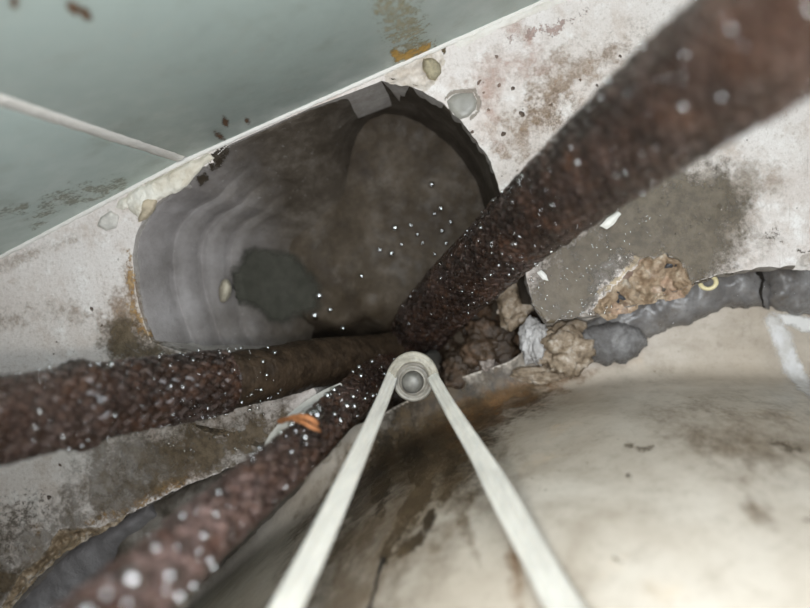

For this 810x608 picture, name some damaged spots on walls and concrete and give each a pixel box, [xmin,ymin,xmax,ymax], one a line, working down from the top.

corrosion [391,42,431,63]
corrosion [507,19,574,44]
corrosion [507,46,618,146]
leakage [0,402,290,605]
crack [367,556,386,608]